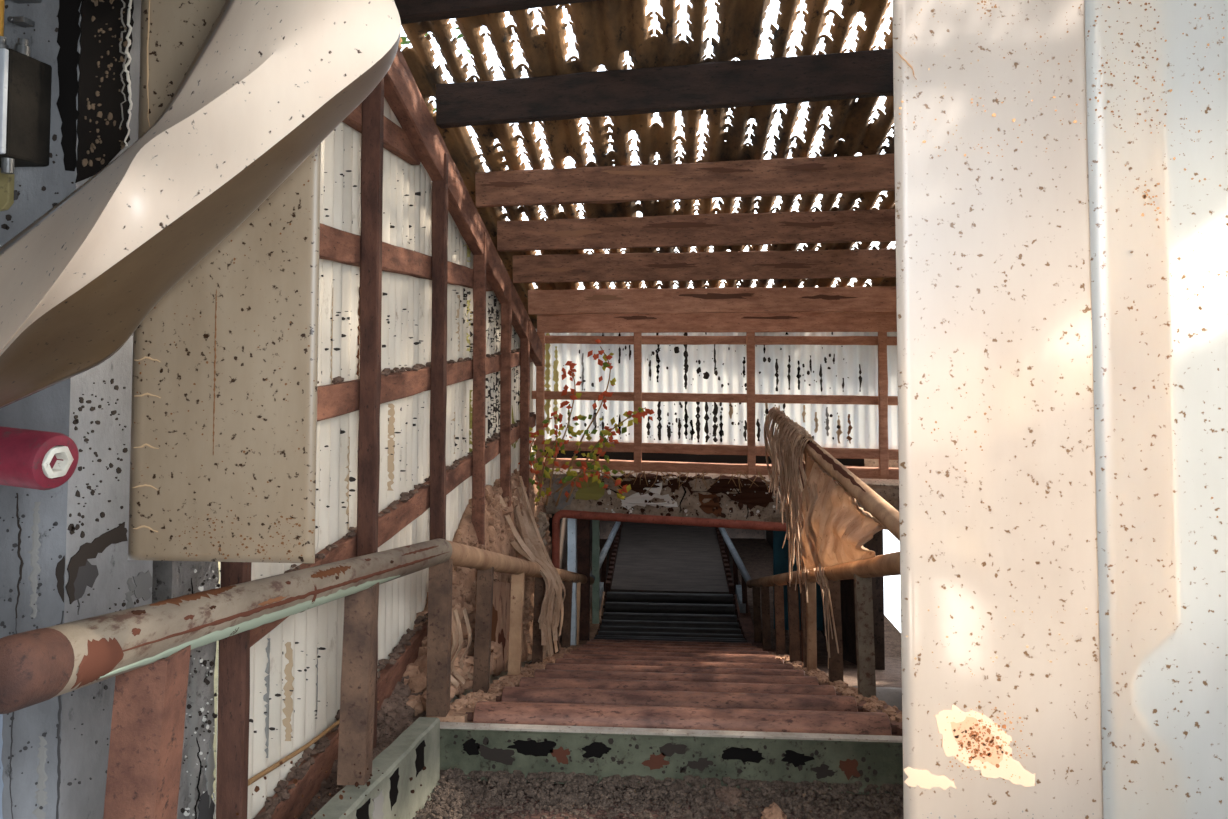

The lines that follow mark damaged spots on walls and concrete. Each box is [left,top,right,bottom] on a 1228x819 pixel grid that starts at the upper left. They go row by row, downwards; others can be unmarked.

spalling [74,560,99,601]
peeling [415,740,426,777]
peeling [453,734,840,779]
corrosion [934,701,1036,787]
peeling [356,767,400,819]